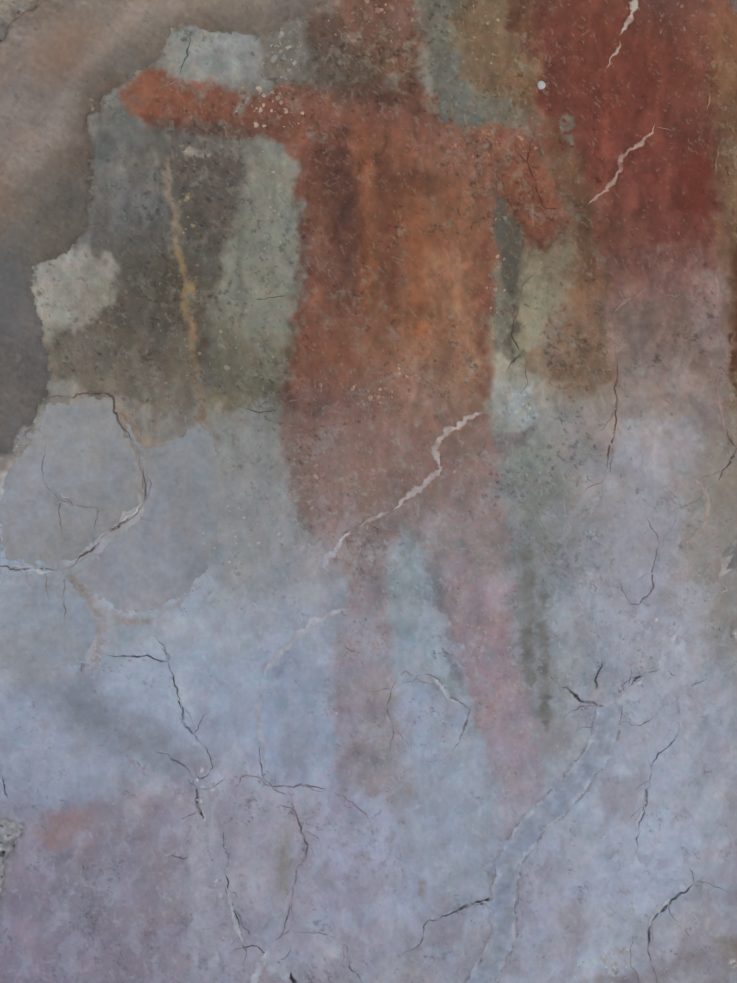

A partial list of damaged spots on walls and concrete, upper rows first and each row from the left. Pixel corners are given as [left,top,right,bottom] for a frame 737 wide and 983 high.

spalling [230,31,305,127]
spalling [177,143,218,160]